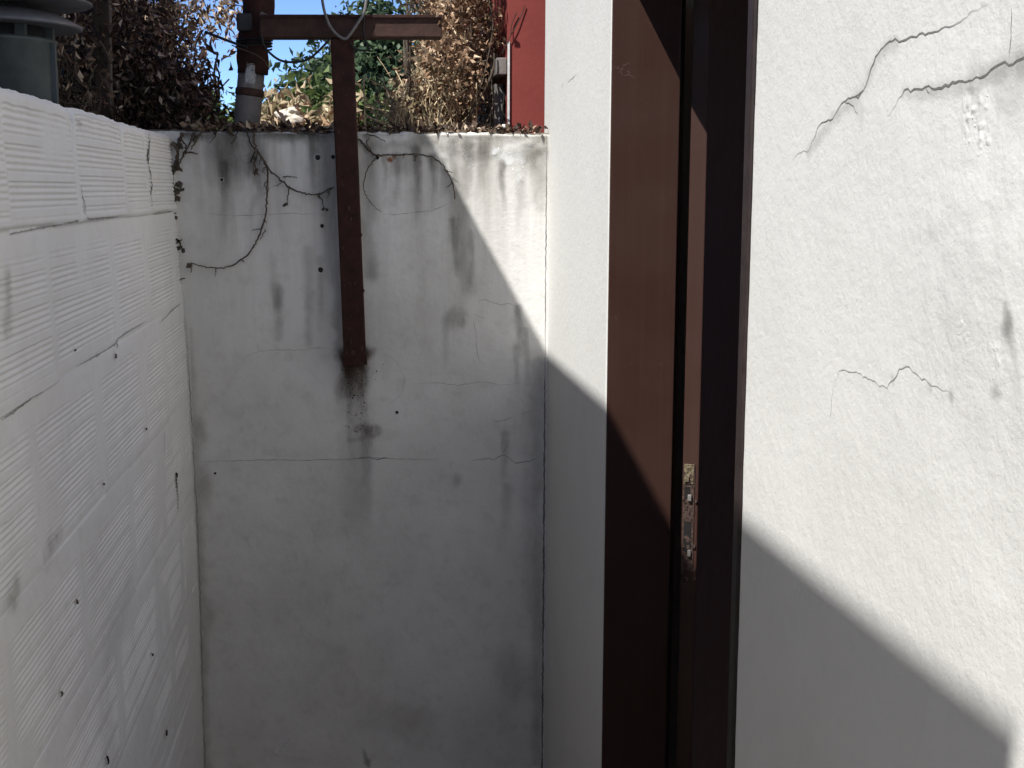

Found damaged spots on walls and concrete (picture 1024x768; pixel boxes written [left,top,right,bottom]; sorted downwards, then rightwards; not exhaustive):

crack [795,5,985,157]
crack [887,11,1024,117]
corrosion [339,345,384,433]
crack [830,366,950,414]
crack [80,292,441,768]